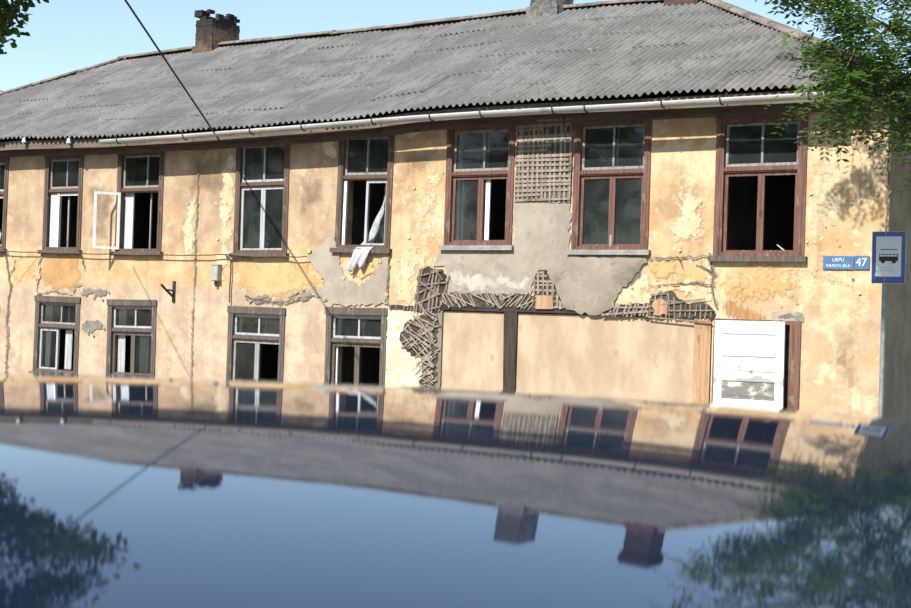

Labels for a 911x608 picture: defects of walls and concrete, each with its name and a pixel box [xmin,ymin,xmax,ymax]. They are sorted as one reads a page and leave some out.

crack [4,250,15,372]
crack [35,254,85,295]
spalling [214,118,574,387]